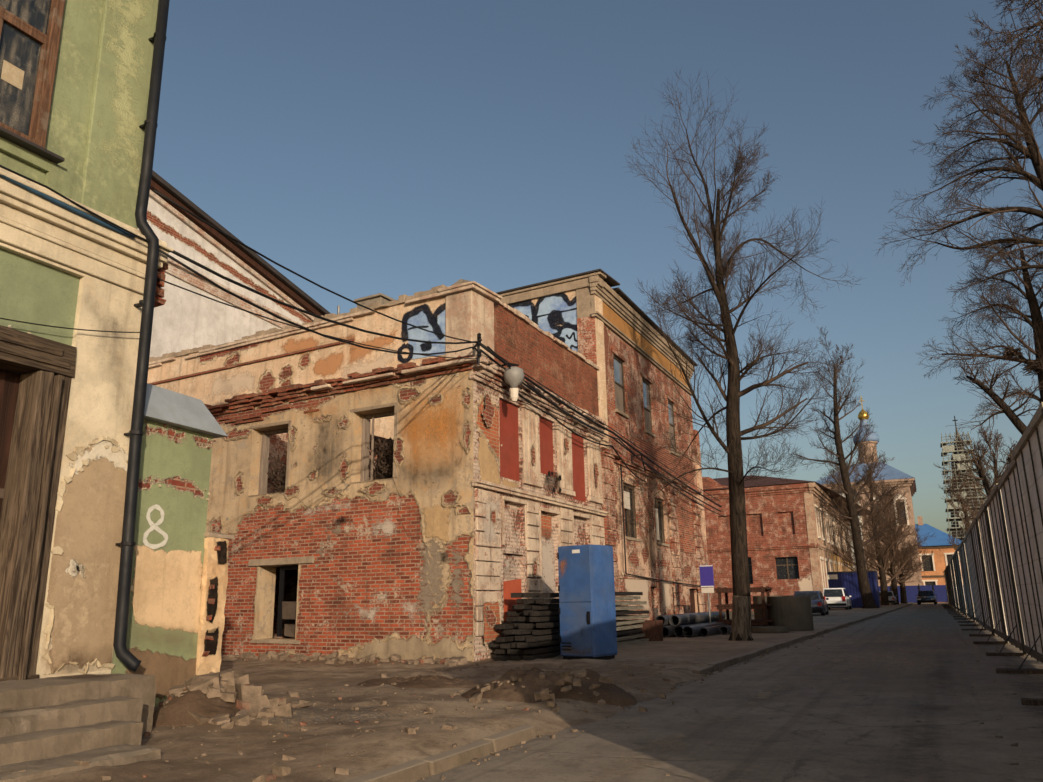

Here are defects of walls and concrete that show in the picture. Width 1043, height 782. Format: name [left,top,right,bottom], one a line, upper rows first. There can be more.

spalling [42,436,210,675]
flaking render [145,393,351,467]
flaking render [202,450,501,657]
flaking render [541,514,552,539]